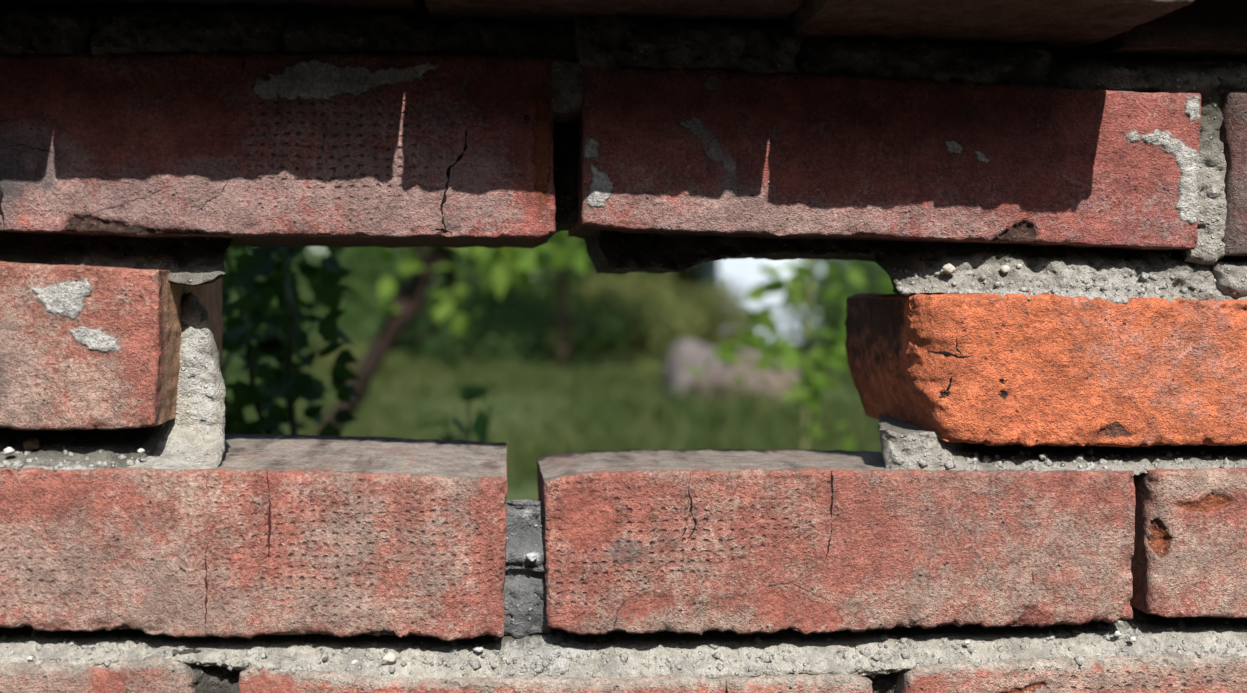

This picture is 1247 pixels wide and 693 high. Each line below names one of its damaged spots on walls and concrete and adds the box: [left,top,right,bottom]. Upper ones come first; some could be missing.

crack [0,187,8,229]
crack [434,126,491,232]
crack [265,470,273,558]
crack [680,472,697,543]
crack [825,471,834,560]
spalling [1148,519,1172,558]
spalling [1175,492,1236,512]
spalling [1000,681,1047,693]